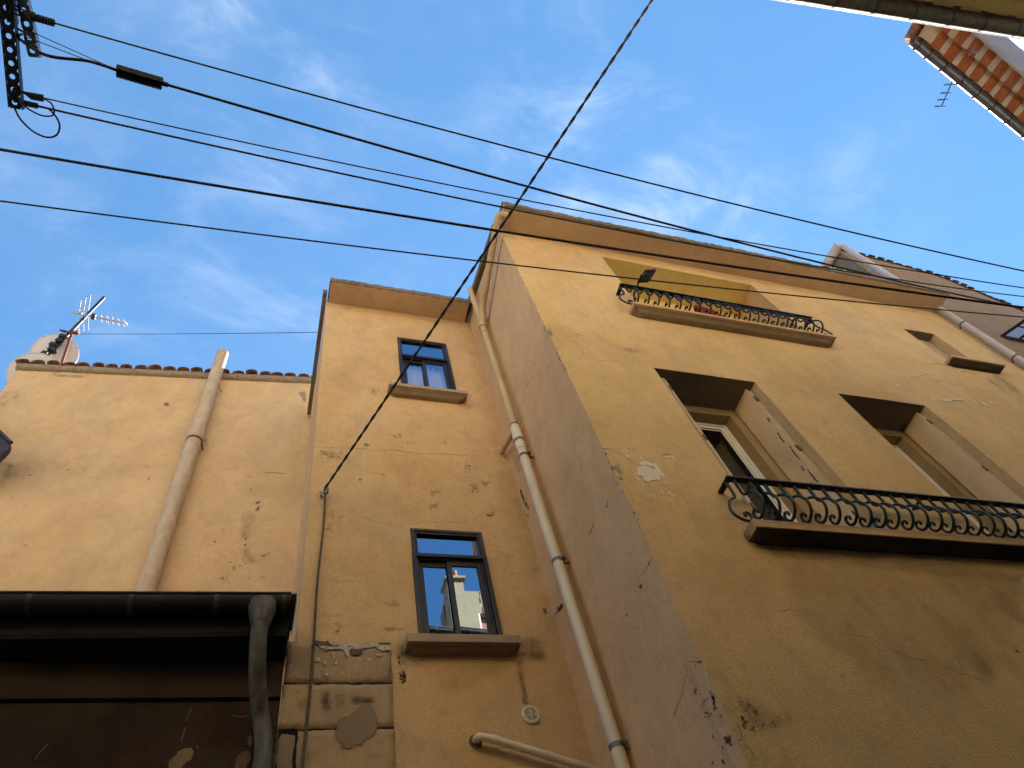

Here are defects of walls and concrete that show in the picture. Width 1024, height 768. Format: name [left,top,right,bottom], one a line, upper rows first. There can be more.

peeling [601,448,676,497]
spalling [315,640,363,655]